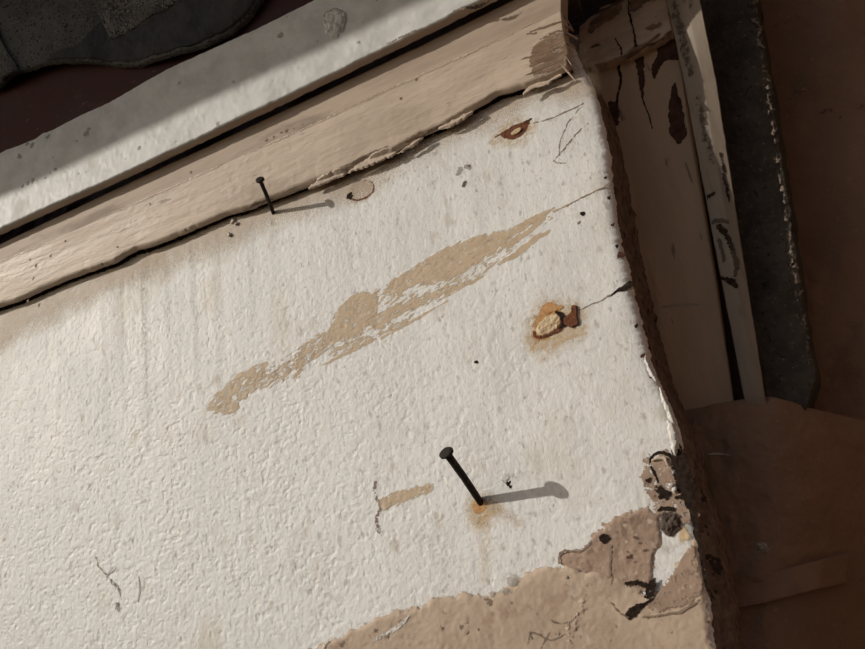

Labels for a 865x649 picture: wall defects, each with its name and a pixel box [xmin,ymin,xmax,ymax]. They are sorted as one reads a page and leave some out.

peeling [308,111,474,190]
rust [490,118,532,144]
peeling [523,74,562,95]
crack [535,103,589,164]
peeling [634,34,679,129]
peeling [668,83,687,144]
rust [343,179,374,202]
peeling [206,218,534,415]
rust [526,300,586,351]
peeling [378,483,434,511]
rust [470,497,498,527]
peeling [558,353,702,613]